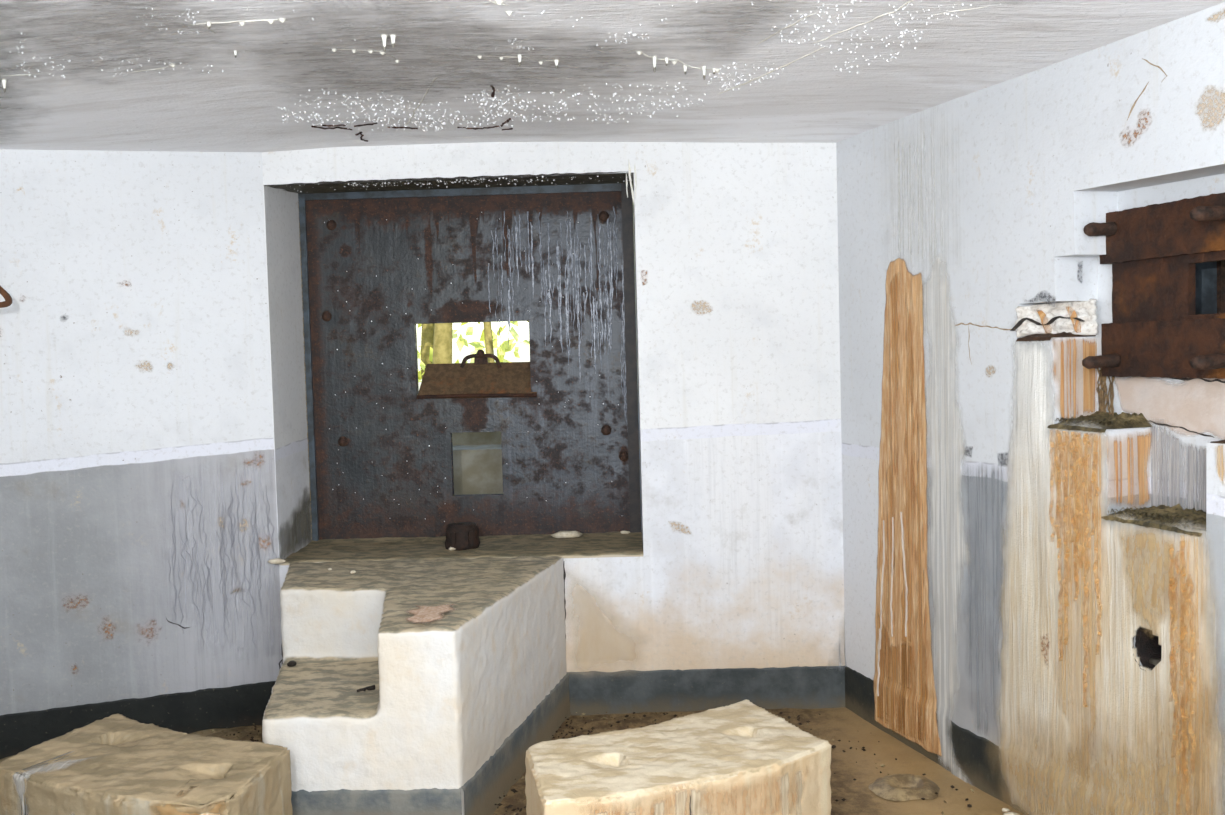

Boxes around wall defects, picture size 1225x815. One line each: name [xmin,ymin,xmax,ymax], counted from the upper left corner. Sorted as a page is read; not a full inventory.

damp [48,1,188,69]
damp [290,11,629,92]
crack [951,323,1011,364]
spalling [1010,292,1098,338]
corrosion [1053,339,1097,418]
corrosion [874,258,943,758]
damp [924,259,1004,782]
corrosion [1041,433,1151,771]
corrosion [1126,533,1172,627]